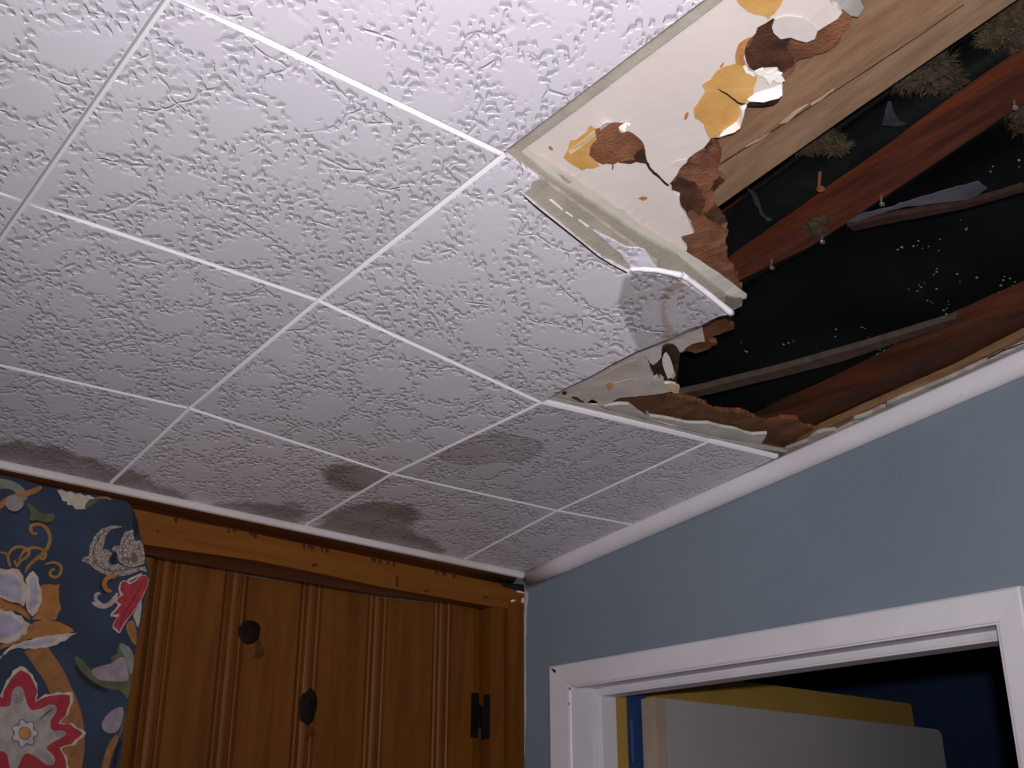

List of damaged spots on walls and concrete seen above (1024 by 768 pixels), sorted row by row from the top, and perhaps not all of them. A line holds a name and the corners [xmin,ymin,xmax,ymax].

peeling [736,0,817,43]
peeling [684,37,785,139]
peeling [548,122,650,170]
damp [327,465,364,491]
damp [354,503,440,552]